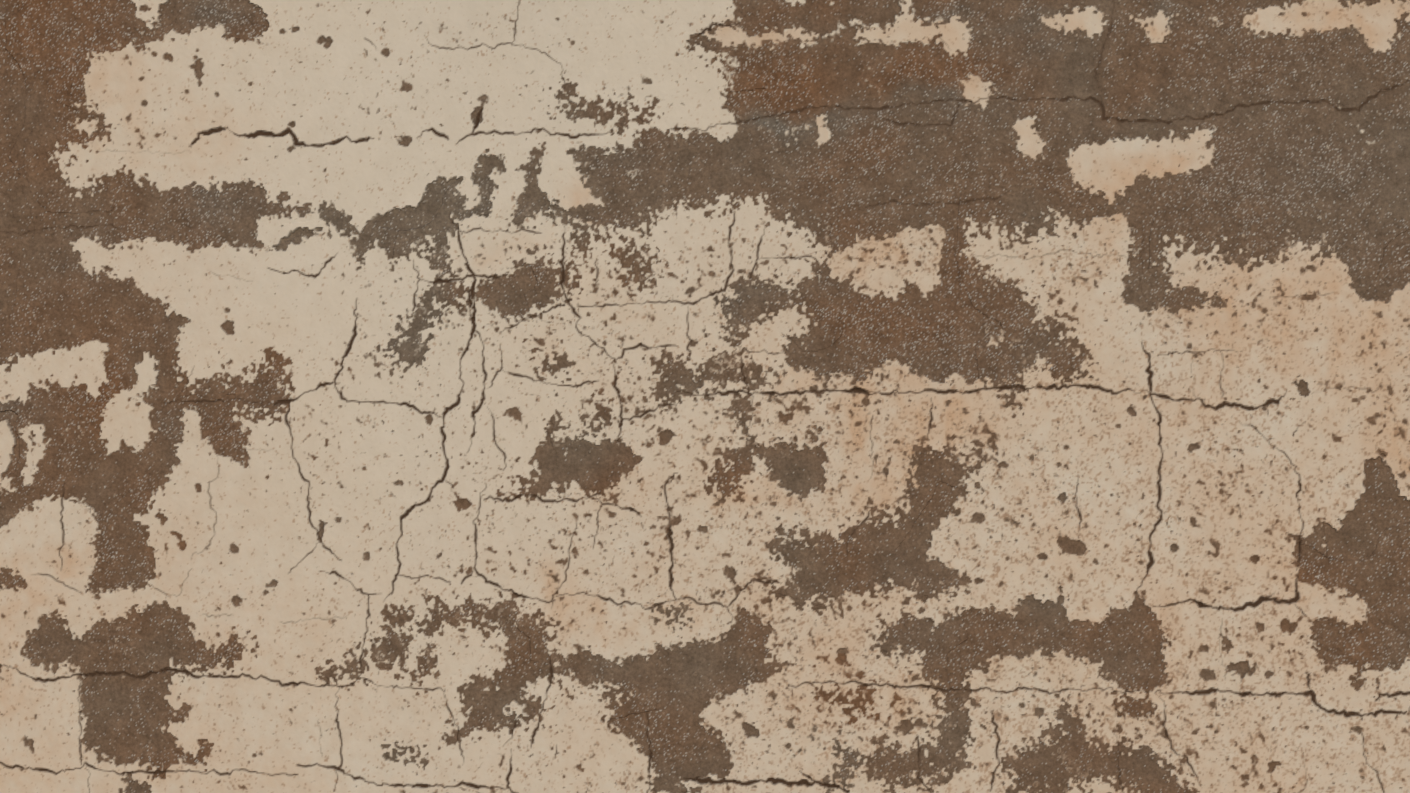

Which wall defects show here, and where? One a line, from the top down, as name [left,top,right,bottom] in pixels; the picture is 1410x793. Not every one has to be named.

crack [96,125,375,156]
crack [363,37,378,51]
crack [423,0,567,91]
crack [415,107,615,145]
peeling [0,0,1410,601]
crack [0,190,1410,793]
peeling [315,394,1410,793]
peeling [0,601,257,793]